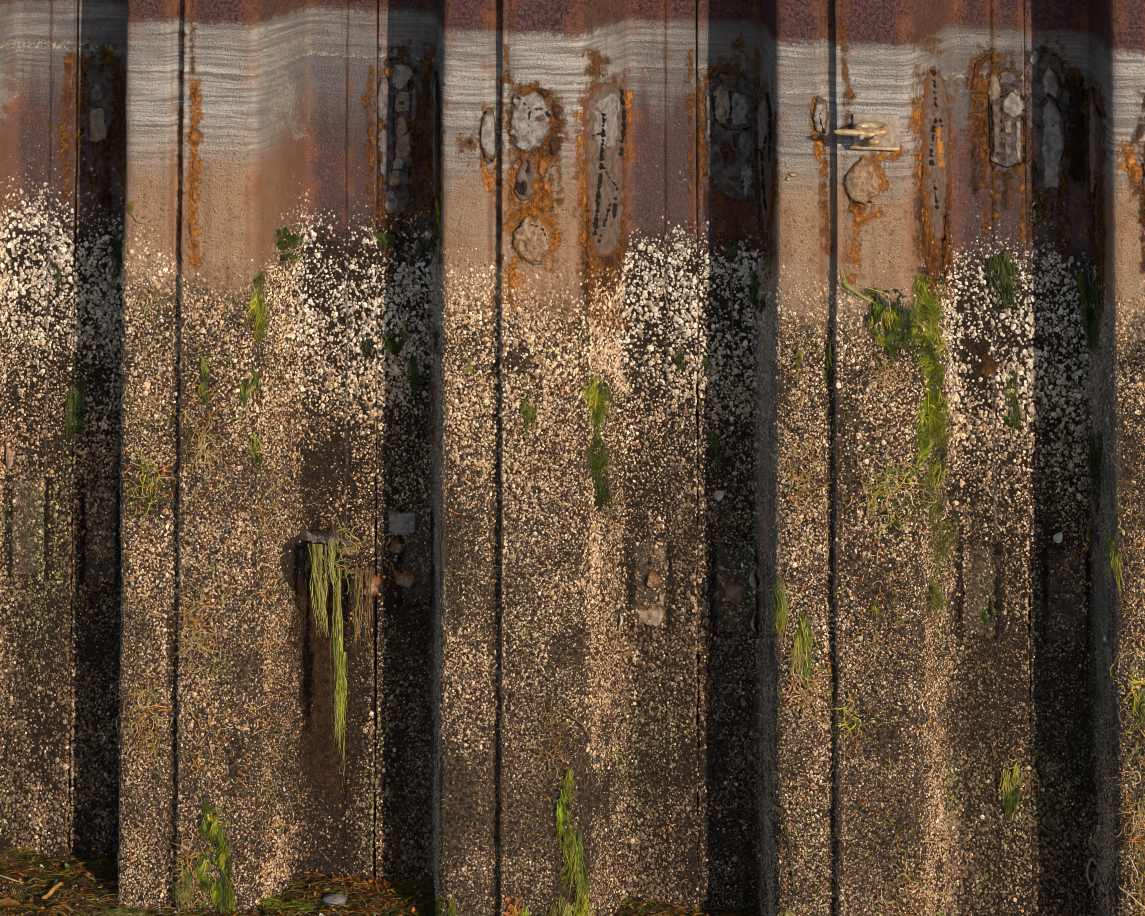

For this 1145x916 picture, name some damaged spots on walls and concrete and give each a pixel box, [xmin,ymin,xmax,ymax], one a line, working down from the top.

corrosion [177,27,204,270]
spalling [370,34,445,287]
corrosion [684,49,707,234]
spalling [905,34,1106,312]
corrosion [1111,93,1145,225]